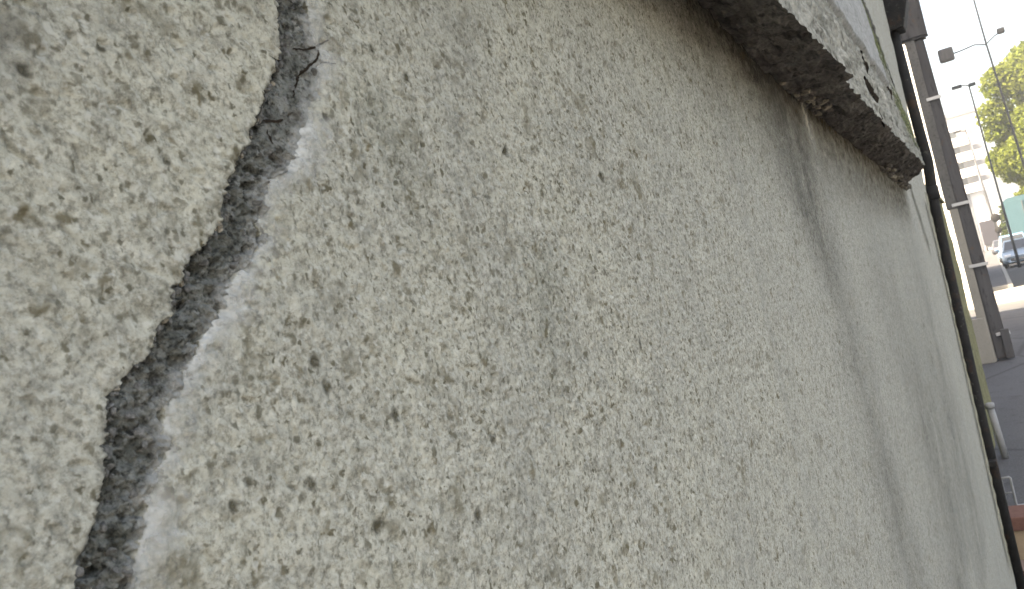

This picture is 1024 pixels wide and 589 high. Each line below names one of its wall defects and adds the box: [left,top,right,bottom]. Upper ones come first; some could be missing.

flaking render [826,0,889,87]
spalling [880,163,912,191]
crack [74,0,336,589]
leakage [163,115,316,435]
leakage [133,501,161,589]